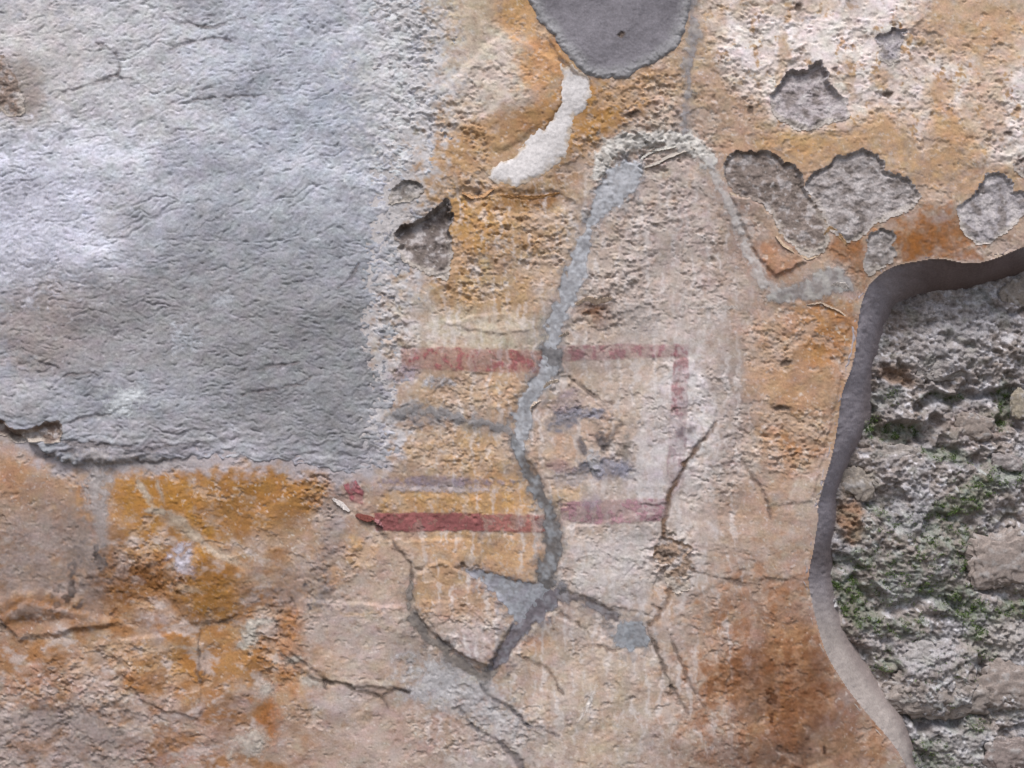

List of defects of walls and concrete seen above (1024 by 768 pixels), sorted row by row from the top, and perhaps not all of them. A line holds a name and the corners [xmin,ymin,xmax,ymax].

spalling [393,198,454,281]
crack [392,0,854,728]
spalling [769,59,851,131]
spalling [723,147,1024,768]